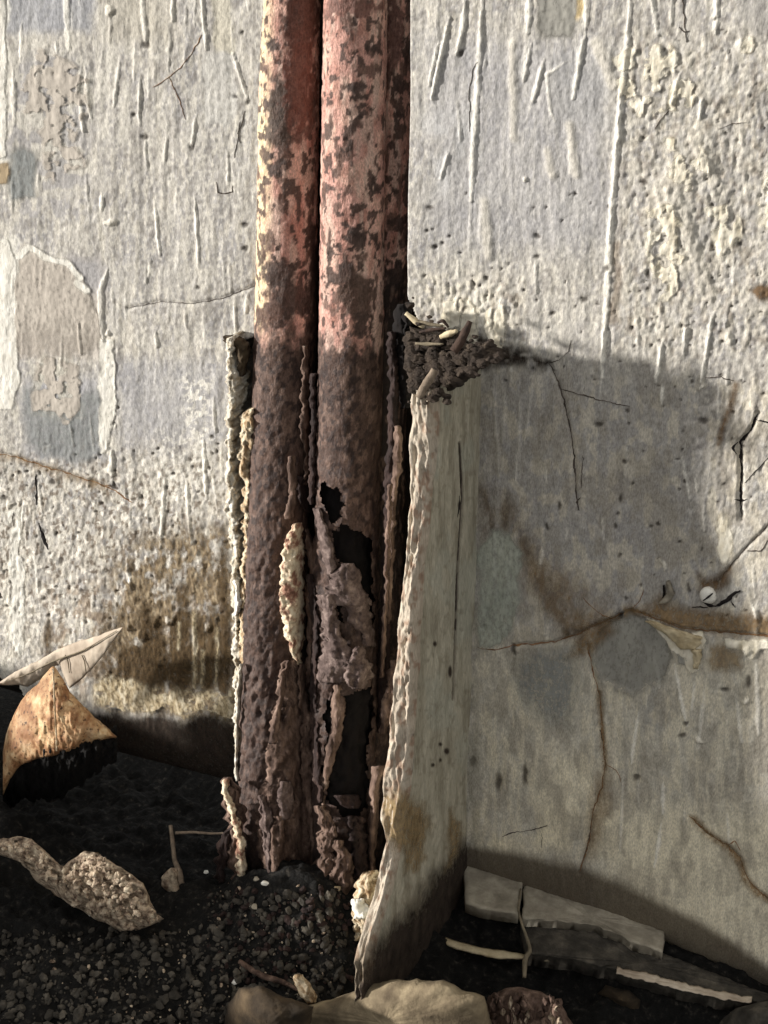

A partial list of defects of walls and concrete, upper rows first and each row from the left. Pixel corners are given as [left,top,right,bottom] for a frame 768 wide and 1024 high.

peeling [0,239,117,454]
flaking render [441,299,505,348]
peeling [4,507,25,657]
leakage [43,625,51,657]
crack [0,454,132,549]
leakage [93,526,235,725]
rust [212,304,428,941]
crack [549,341,627,510]
spalling [593,612,768,695]
crack [724,525,768,573]
crack [731,414,768,515]
crack [478,589,768,872]